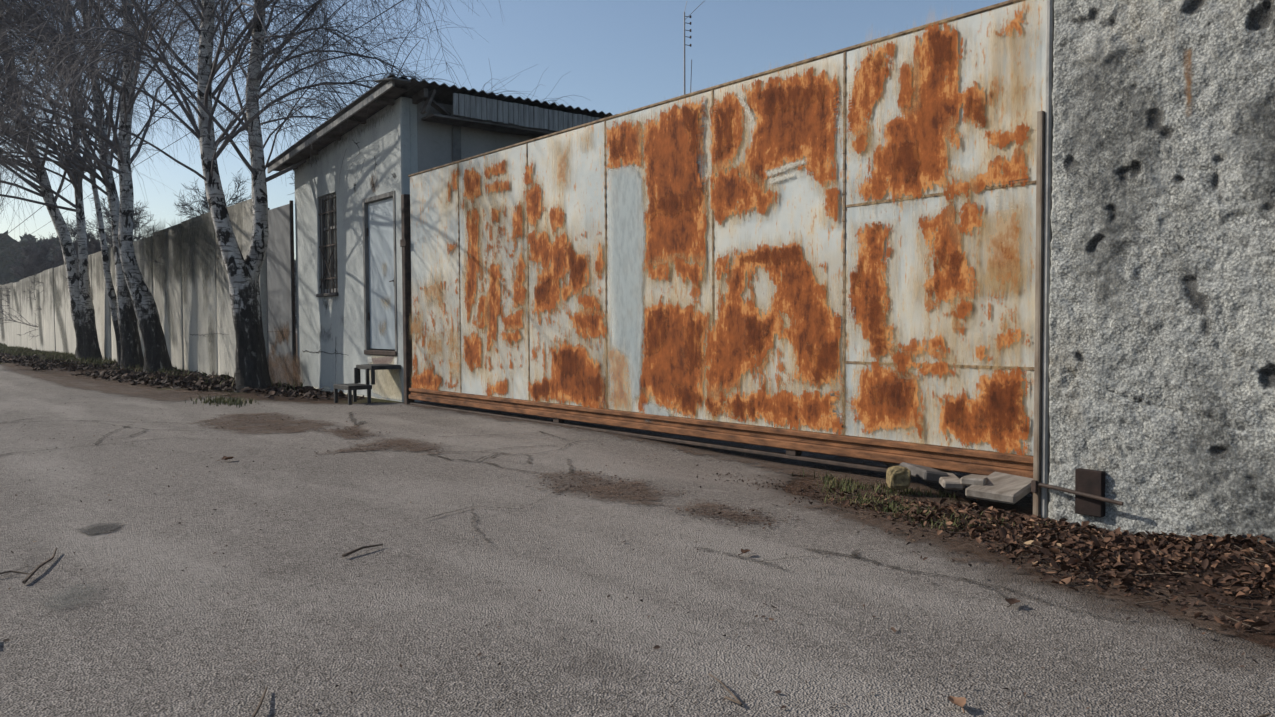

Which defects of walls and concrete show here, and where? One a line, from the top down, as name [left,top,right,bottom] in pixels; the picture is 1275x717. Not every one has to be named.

spalling [1072,4,1122,25]
spalling [1167,0,1206,15]
spalling [1246,0,1273,31]
rust [993,7,1029,66]
spalling [1146,109,1172,139]
spalling [1063,156,1076,172]
spalling [1116,160,1141,180]
rust [410,23,1030,456]
spalling [1088,206,1116,255]
damp [142,220,214,340]
damp [0,281,67,352]
spalling [1259,365,1275,388]